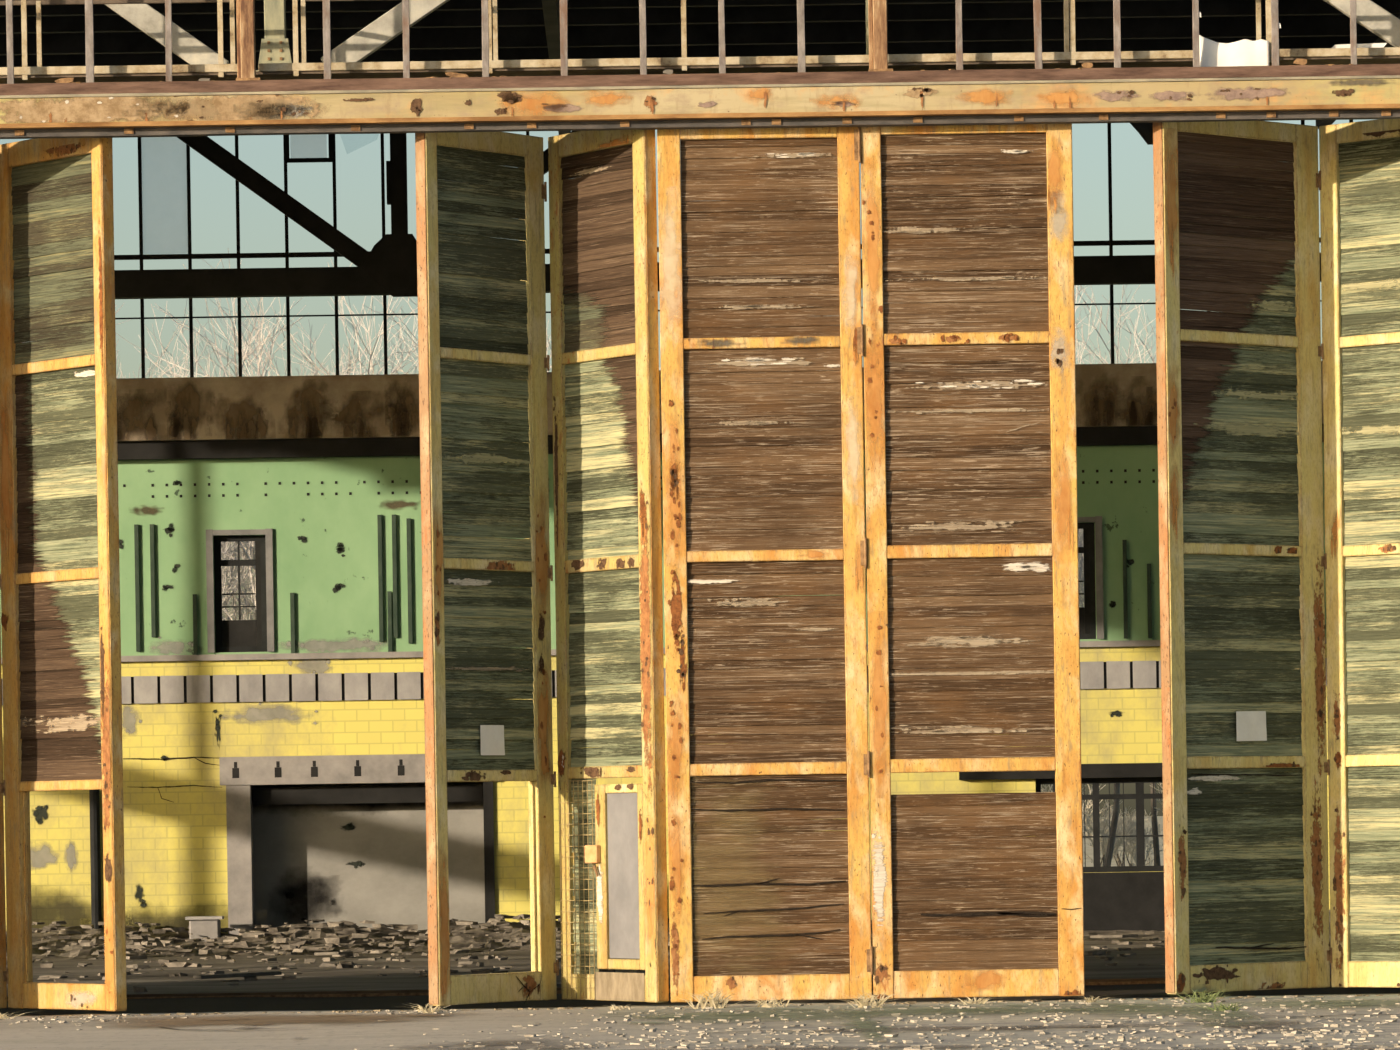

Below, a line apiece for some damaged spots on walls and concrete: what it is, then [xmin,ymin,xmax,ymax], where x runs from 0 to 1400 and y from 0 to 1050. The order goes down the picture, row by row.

rust [503,95,565,116]
rust [644,95,657,114]
rust [749,88,769,107]
rust [818,96,858,111]
rust [967,90,1003,107]